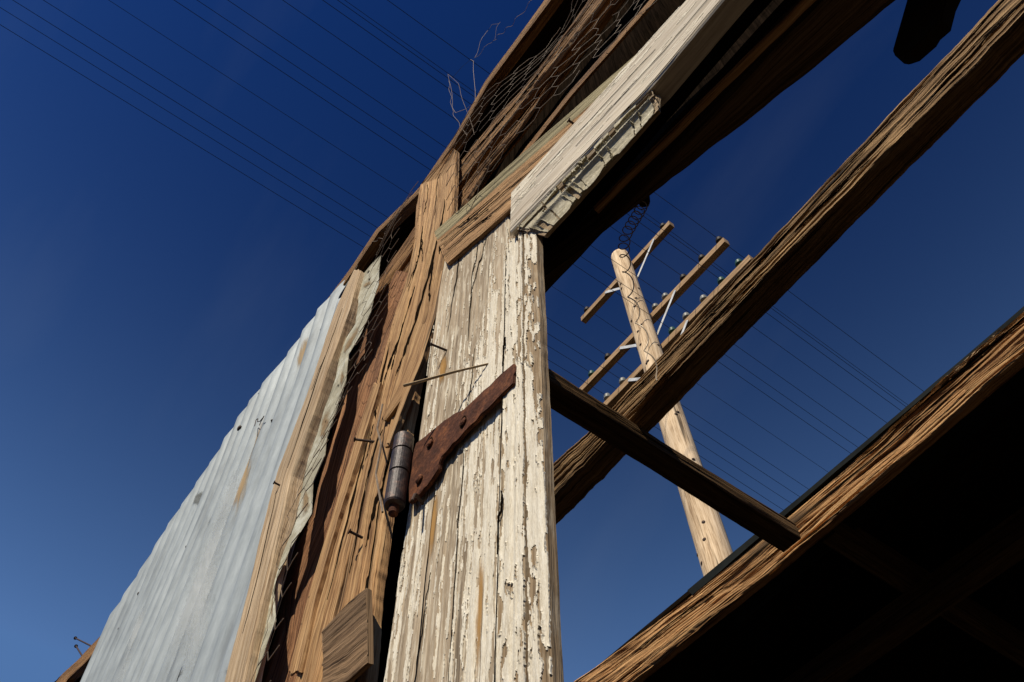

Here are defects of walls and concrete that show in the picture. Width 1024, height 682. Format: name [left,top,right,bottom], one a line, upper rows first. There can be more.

crack [327,0,720,682]
peeling [384,2,703,682]
crack [596,0,1023,469]